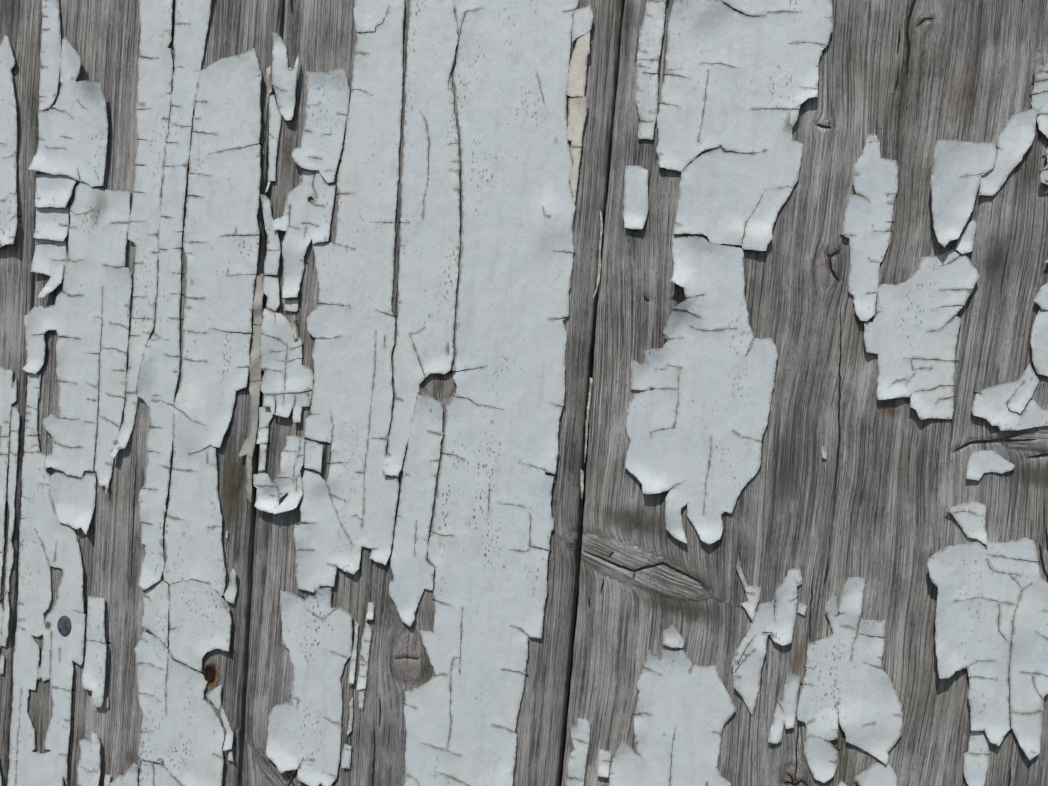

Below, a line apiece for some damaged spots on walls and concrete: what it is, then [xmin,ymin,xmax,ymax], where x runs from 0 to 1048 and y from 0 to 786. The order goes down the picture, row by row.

peeling [623,0,833,544]
peeling [840,48,1048,431]
peeling [0,0,594,786]
crack [584,551,710,608]
peeling [566,556,807,786]
peeling [768,577,903,786]
peeling [927,501,1048,786]
peeling [966,450,1015,480]
crack [951,439,1048,458]